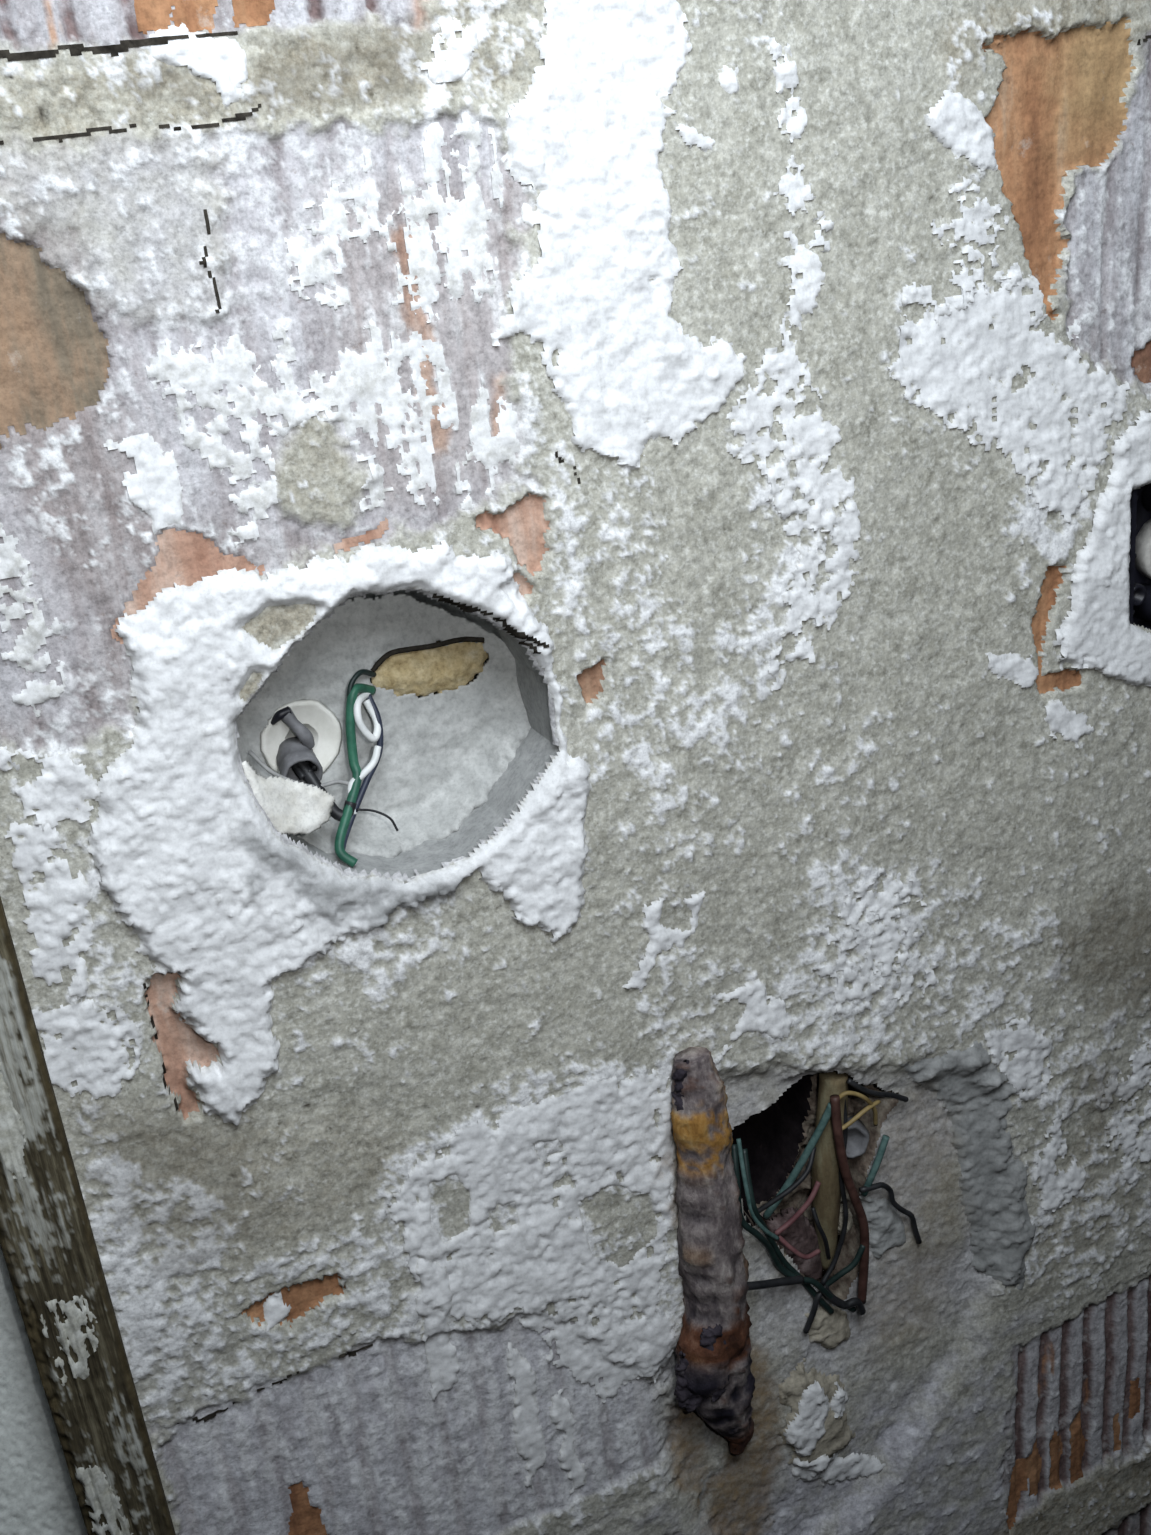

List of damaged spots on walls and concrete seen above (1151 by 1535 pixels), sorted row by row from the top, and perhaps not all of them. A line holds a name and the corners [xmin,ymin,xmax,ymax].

crack [0,31,238,61]
spalling [0,233,110,450]
flaking render [103,0,862,691]
flaking render [887,17,1151,523]
flaking render [0,523,66,717]
flaking render [985,566,1095,748]
flaking render [0,746,220,1120]
rust [671,1059,689,1111]
flaking render [984,1018,1053,1101]
flaking render [1032,1113,1086,1212]
flaking render [1096,1039,1151,1184]
rust [674,1324,730,1413]